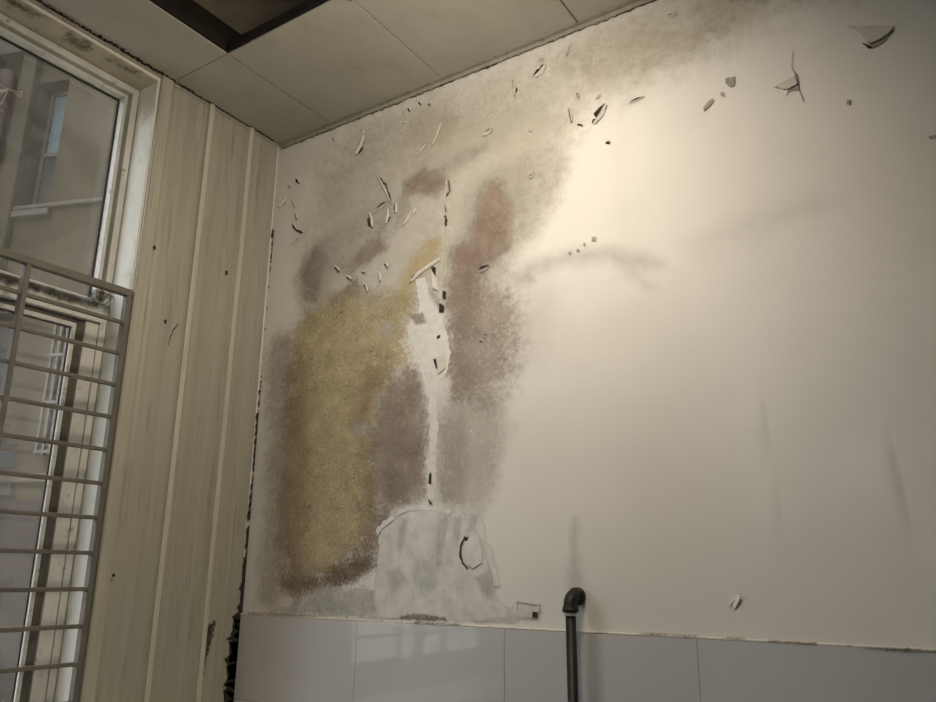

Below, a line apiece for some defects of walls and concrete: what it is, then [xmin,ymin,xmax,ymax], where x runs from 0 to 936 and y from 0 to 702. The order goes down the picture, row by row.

spalling [848,25,894,49]
spalling [703,77,735,111]
spalling [774,54,804,102]
peeling [367,173,416,232]
peeling [371,257,519,624]